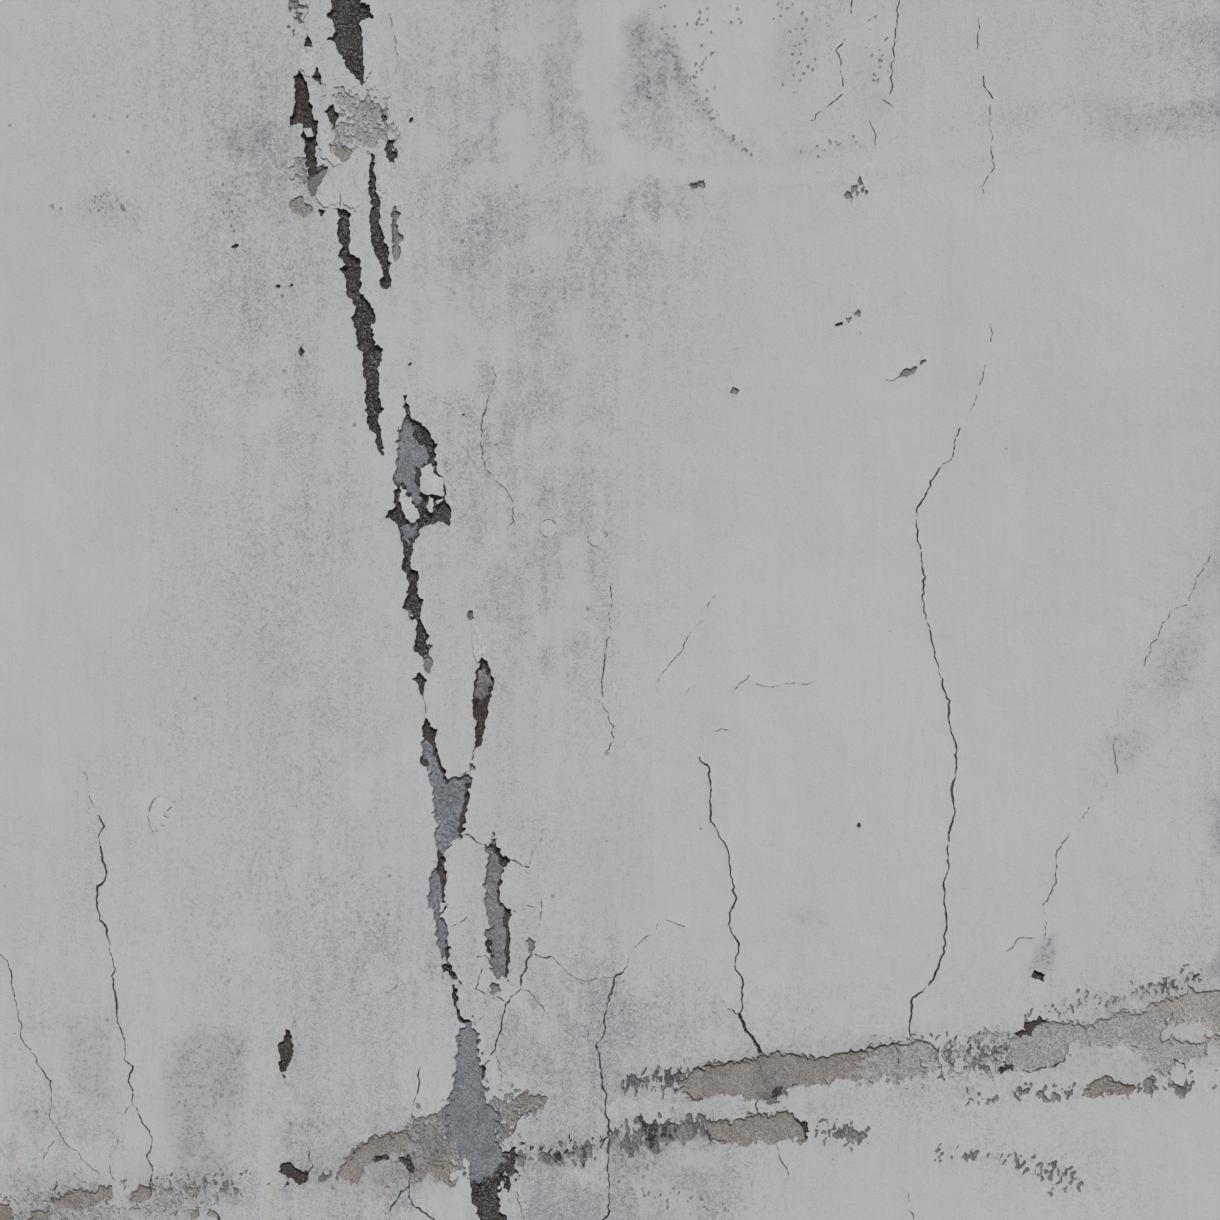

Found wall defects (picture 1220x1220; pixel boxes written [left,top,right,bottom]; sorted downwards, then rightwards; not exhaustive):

peeling [286,0,413,217]
crack [977,18,995,193]
crack [908,327,993,1037]
crack [0,771,153,1183]
peeling [0,1165,251,1220]
peeling [278,1021,296,1078]
peeling [266,1099,467,1190]
spalling [412,610,543,1002]
crack [698,756,762,1053]
peeling [486,964,1220,1177]
peeling [934,1143,1084,1197]